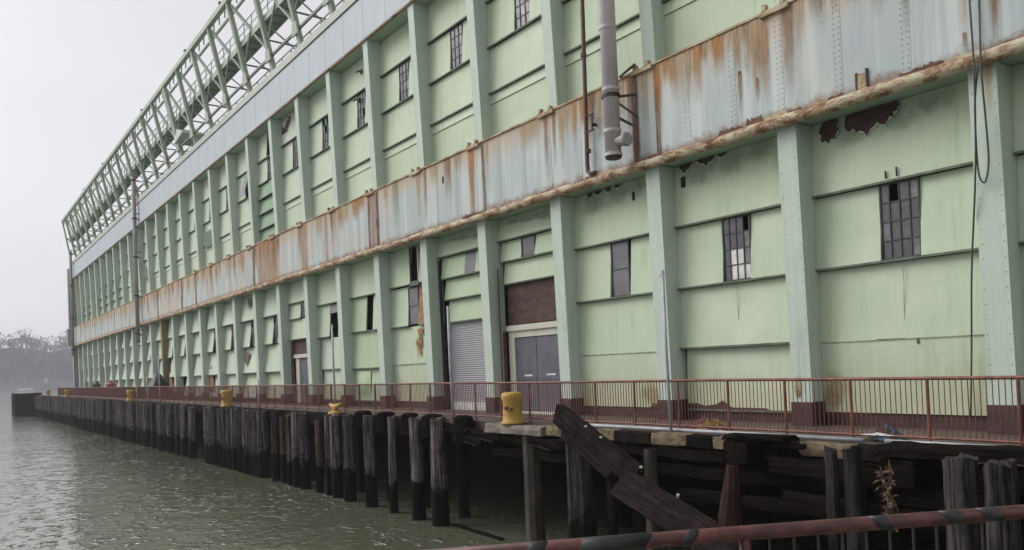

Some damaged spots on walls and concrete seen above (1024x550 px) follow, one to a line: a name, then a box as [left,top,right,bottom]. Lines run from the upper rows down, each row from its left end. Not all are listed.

corrosion [782,0,802,50]
corrosion [521,90,601,141]
corrosion [618,18,768,162]
peeling [818,101,899,144]
corrosion [417,141,488,213]
peeling [679,152,726,174]
corrosion [298,182,397,270]
corrosion [80,235,279,341]